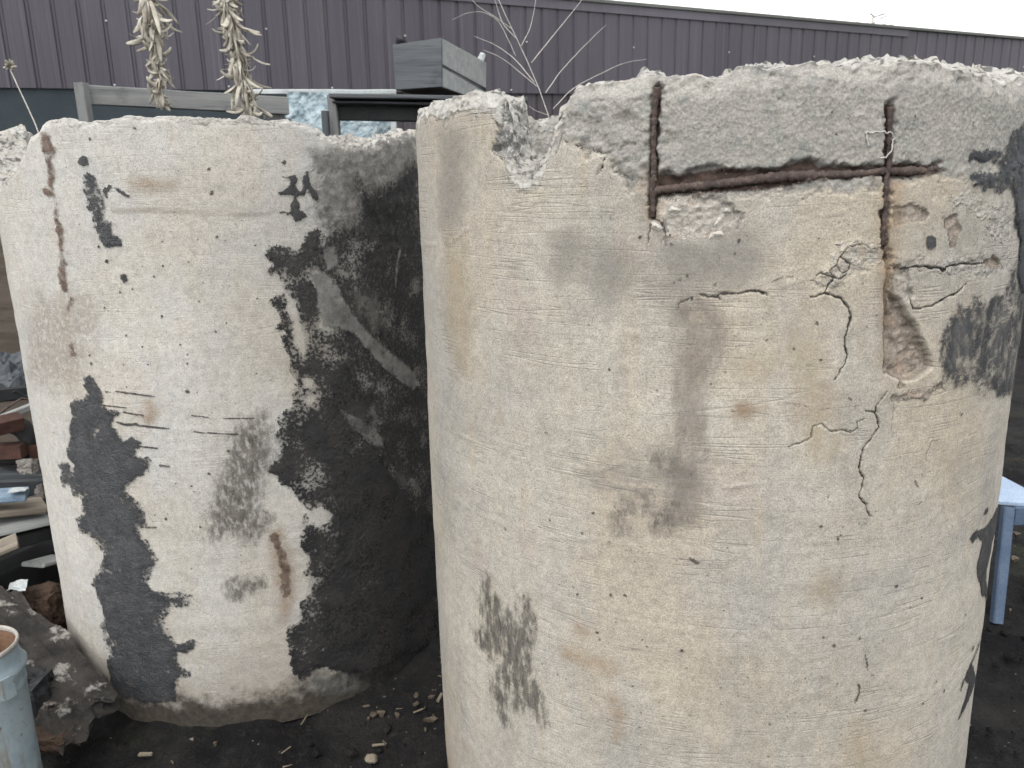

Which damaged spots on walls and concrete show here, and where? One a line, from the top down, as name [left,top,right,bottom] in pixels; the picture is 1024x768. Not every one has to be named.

corrosion [41,134,55,196]
spalling [495,106,520,159]
spalling [562,62,1024,254]
corrosion [53,209,72,310]
spalling [983,255,1001,269]
crack [677,245,982,515]
spalling [882,265,944,401]
corrosion [269,533,292,598]